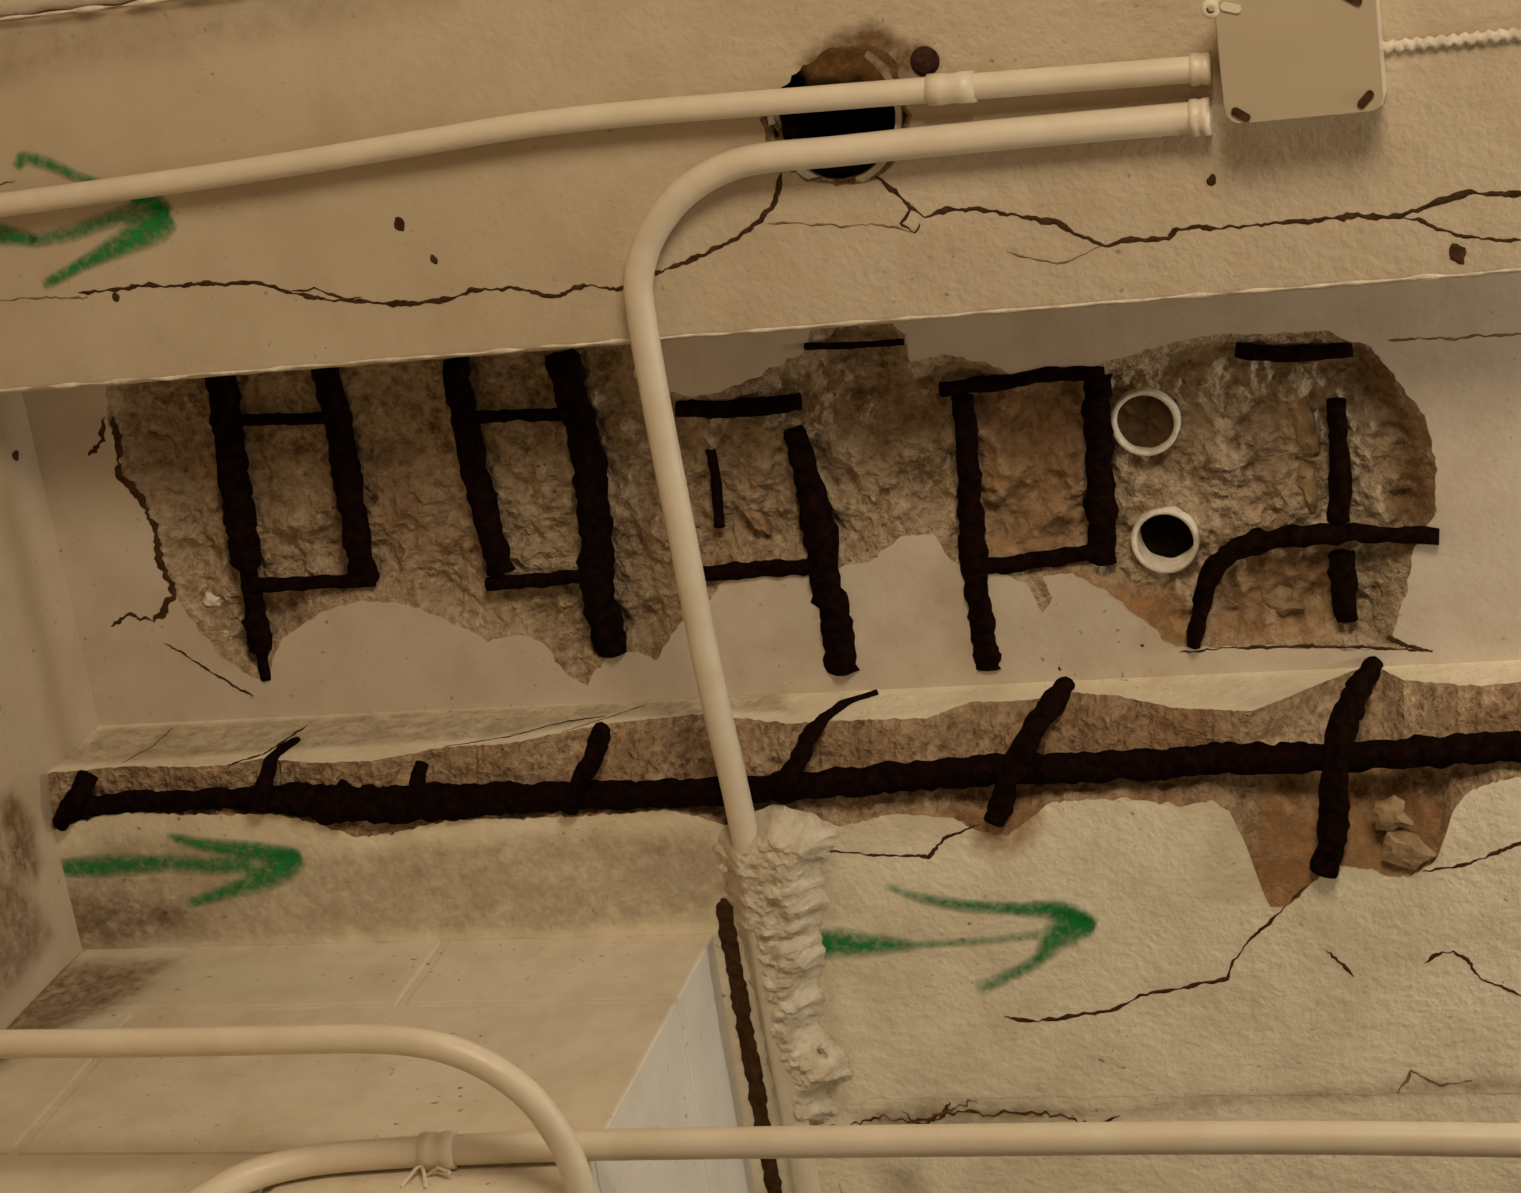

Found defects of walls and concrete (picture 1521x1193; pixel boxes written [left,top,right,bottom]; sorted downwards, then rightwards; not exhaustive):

crack [0,172,1521,308]
corrosion [1358,343,1437,548]
spalling [105,344,684,686]
spalling [669,323,1521,907]
corrosion [1078,576,1186,637]
damp [0,799,36,871]
spalling [48,714,728,837]
corrosion [1259,787,1319,907]
corrosion [1340,786,1436,869]
crack [1004,883,1311,1023]
crack [716,898,782,1193]
crack [831,1099,1120,1125]